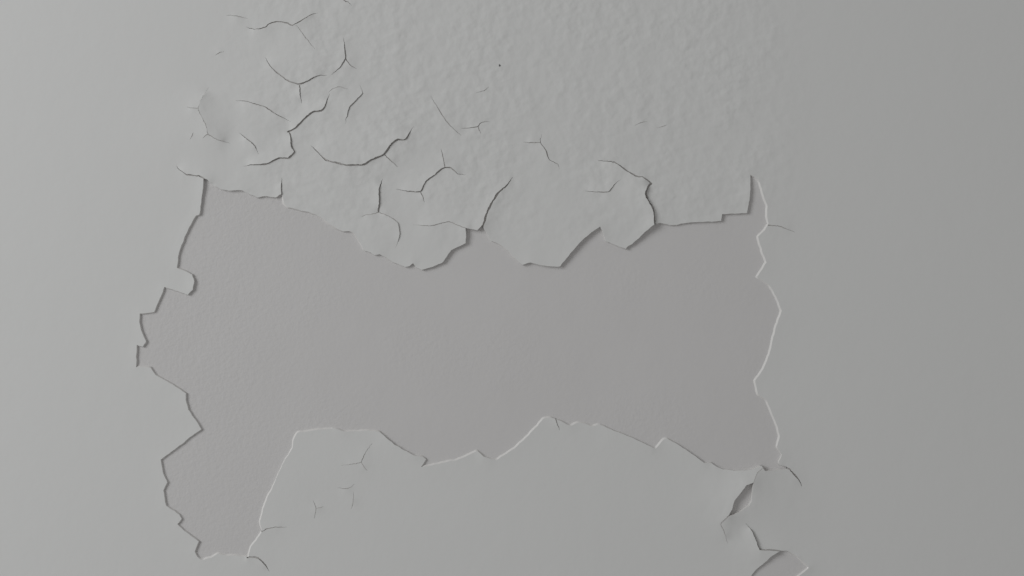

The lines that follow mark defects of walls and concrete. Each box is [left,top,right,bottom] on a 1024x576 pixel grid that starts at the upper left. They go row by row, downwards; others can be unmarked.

crack [232,13,316,49]
crack [189,42,513,246]
crack [588,160,656,224]
peeling [136,160,787,560]
peeling [751,551,809,576]